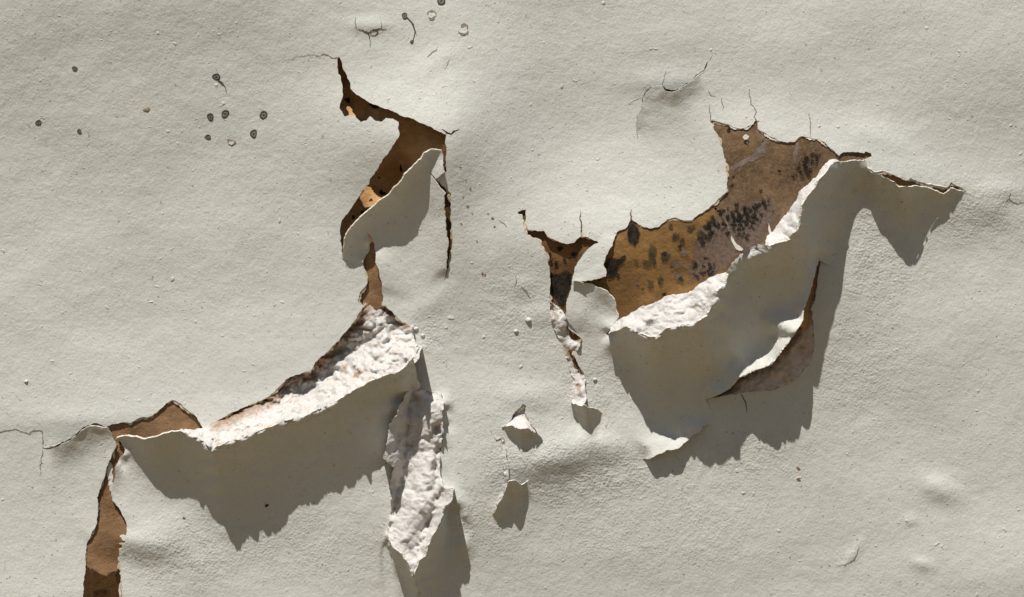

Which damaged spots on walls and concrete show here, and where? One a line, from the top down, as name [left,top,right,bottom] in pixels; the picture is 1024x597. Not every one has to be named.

water stain [727,140,767,187]
water stain [778,142,821,180]
peeling [39,57,548,597]
water stain [598,189,780,297]
peeling [518,119,972,459]
crack [0,429,43,474]